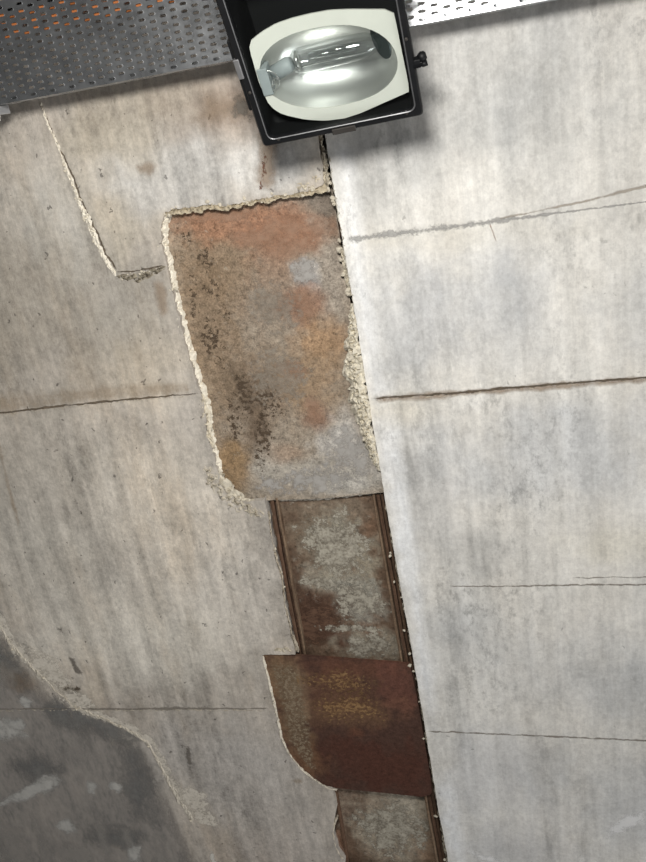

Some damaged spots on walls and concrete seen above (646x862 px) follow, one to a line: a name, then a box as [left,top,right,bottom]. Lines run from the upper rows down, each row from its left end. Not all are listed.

crack [40,102,166,283]
spalling [157,135,448,862]
damp [0,646,192,862]
peeling [0,614,219,827]
corrosion [290,603,338,645]